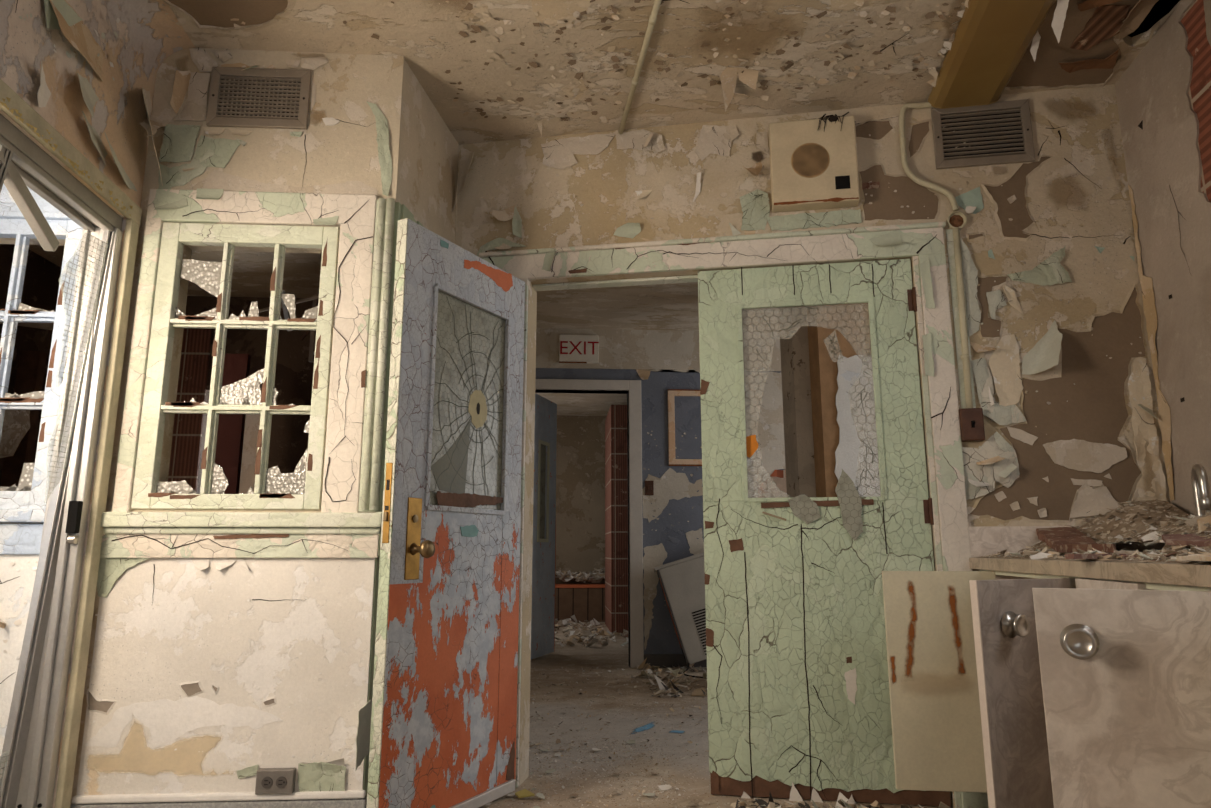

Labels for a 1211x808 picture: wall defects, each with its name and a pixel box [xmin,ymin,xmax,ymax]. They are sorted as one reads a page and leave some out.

peeling [434,0,969,202]
flaking render [739,119,941,235]
flaking render [981,155,1053,241]
flaking render [1178,0,1211,208]
crack [430,296,505,506]
crack [551,244,846,367]
peeling [834,355,881,497]
flaking render [956,185,1175,523]
peeling [642,433,704,649]
crack [713,372,888,801]
corrosion [890,582,917,683]
corrosion [949,587,965,674]